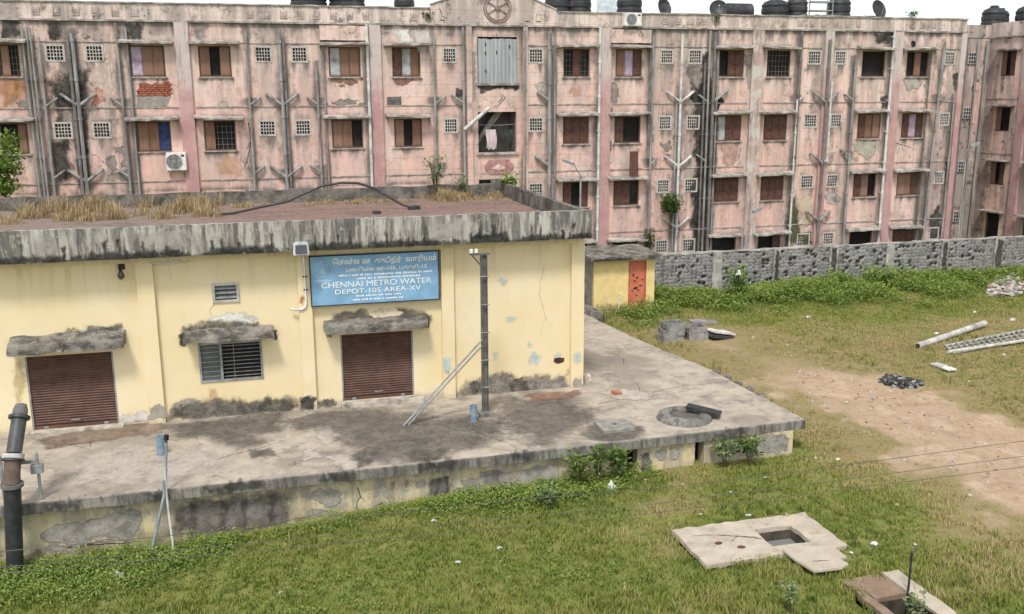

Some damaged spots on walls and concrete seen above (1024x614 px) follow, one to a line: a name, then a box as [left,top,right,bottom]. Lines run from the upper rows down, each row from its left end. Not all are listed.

flaking render [136,81,172,107]
flaking render [902,76,928,91]
leakage [47,71,90,187]
leakage [687,52,738,252]
flaking render [843,140,882,162]
leakage [0,242,66,263]
leakage [89,230,186,260]
leakage [210,234,274,254]
flaking render [119,398,238,424]
leakage [39,396,336,449]
leakage [320,451,372,483]
flaking render [40,505,142,555]